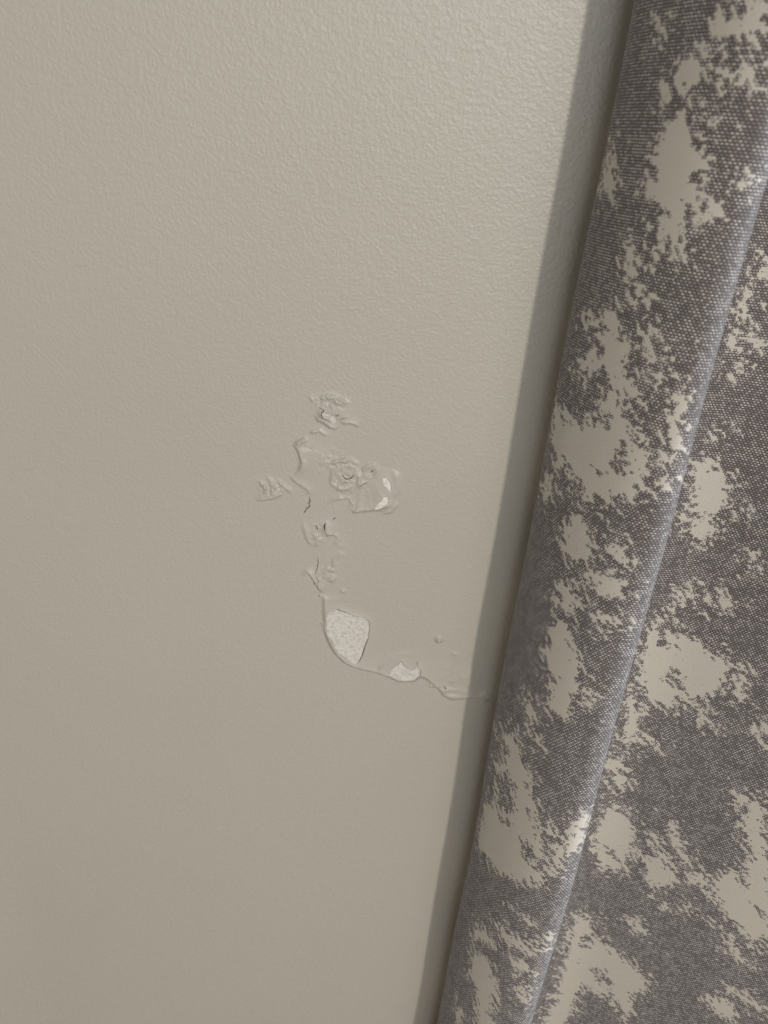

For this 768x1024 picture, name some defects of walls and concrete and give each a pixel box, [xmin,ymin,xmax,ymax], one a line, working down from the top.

peeling [317,601,429,687]